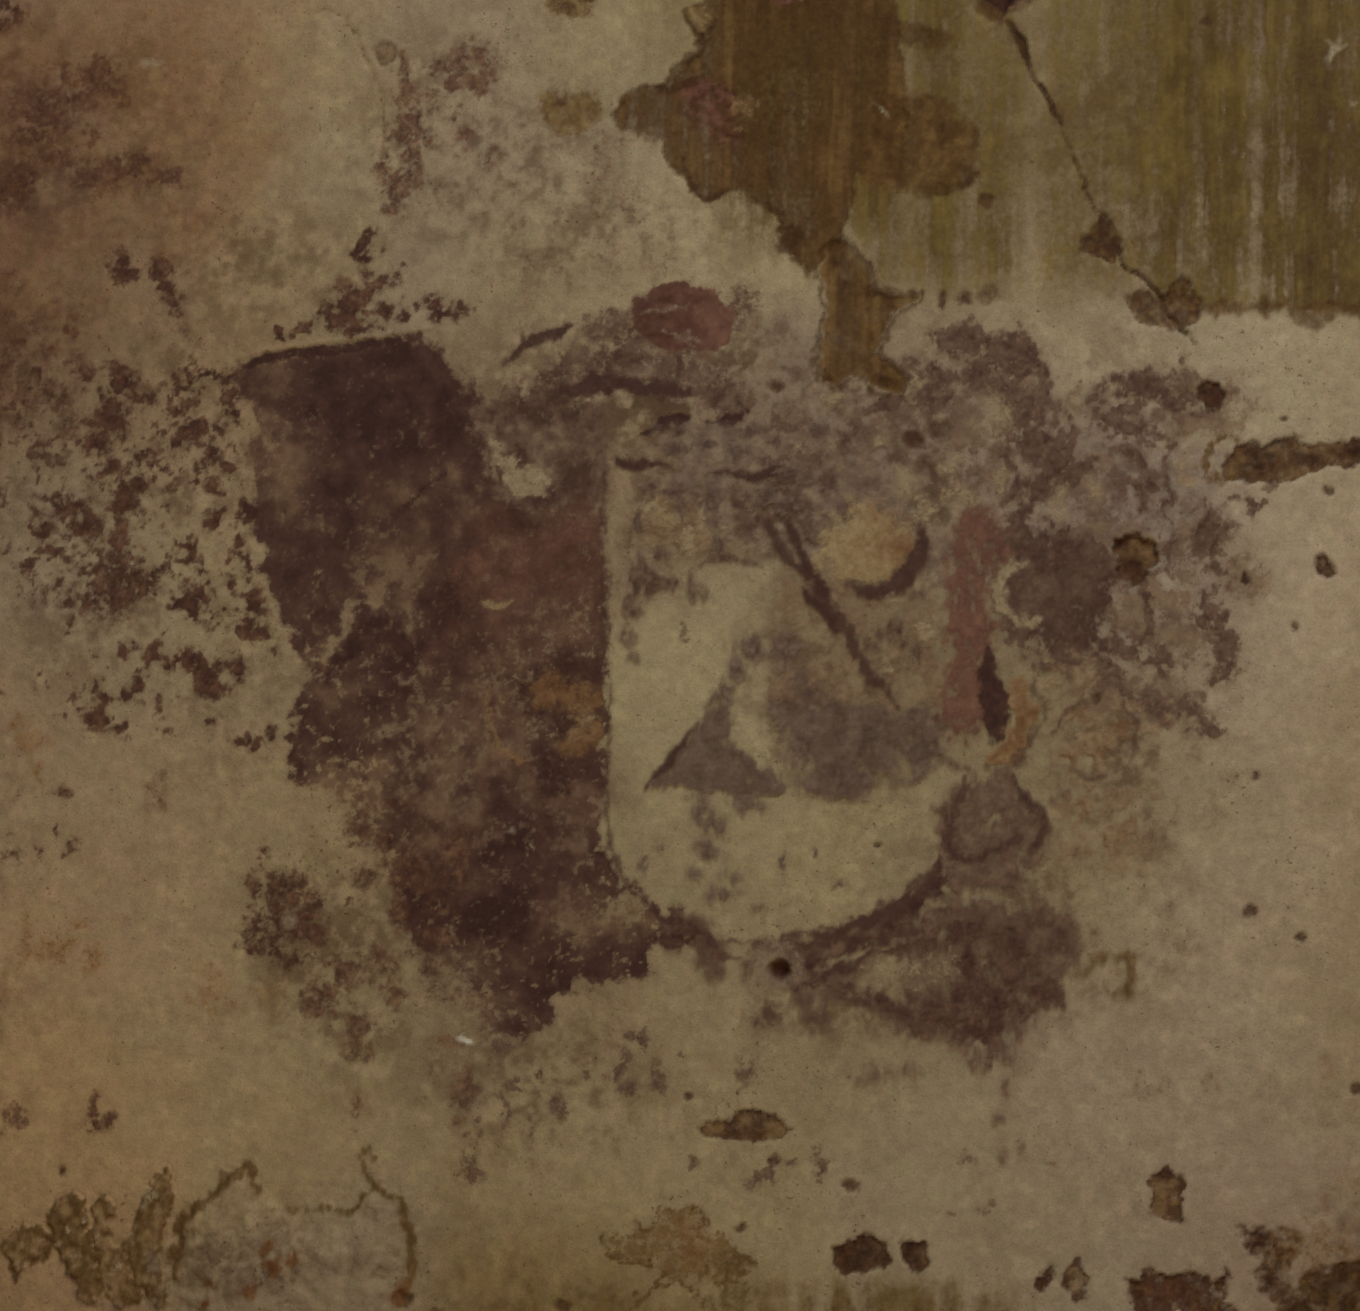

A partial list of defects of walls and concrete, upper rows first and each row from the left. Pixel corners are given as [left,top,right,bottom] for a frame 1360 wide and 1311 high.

crack [1011,28,1062,124]
leakage [0,48,182,218]
peeling [540,0,979,396]
leakage [106,248,185,318]
spalling [1201,434,1360,483]
leakage [0,313,276,734]
leakage [235,725,277,752]
leakage [234,847,326,972]
peeling [0,1166,174,1310]
spalling [833,1235,929,1275]
peeling [1130,1273,1230,1311]
peeling [1245,1228,1360,1311]